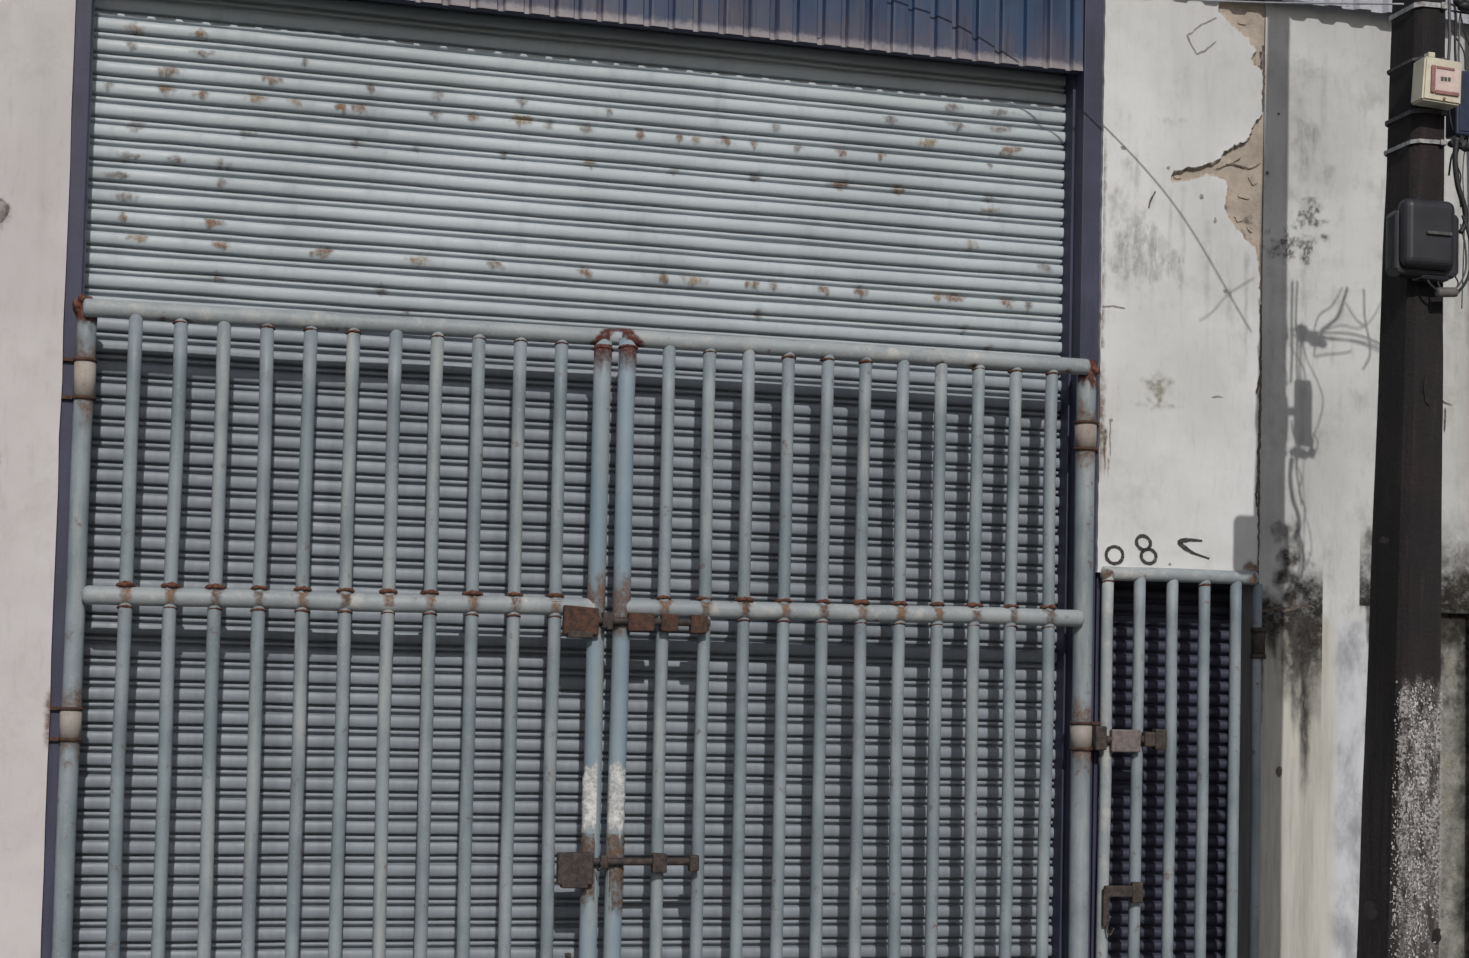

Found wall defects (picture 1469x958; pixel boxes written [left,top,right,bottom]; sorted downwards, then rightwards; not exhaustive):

flaking render [1218,0,1265,71]
flaking render [1167,112,1280,300]
water stain [1261,549,1323,765]
water stain [1360,567,1370,640]
water stain [1441,554,1469,766]
water stain [1441,784,1469,958]